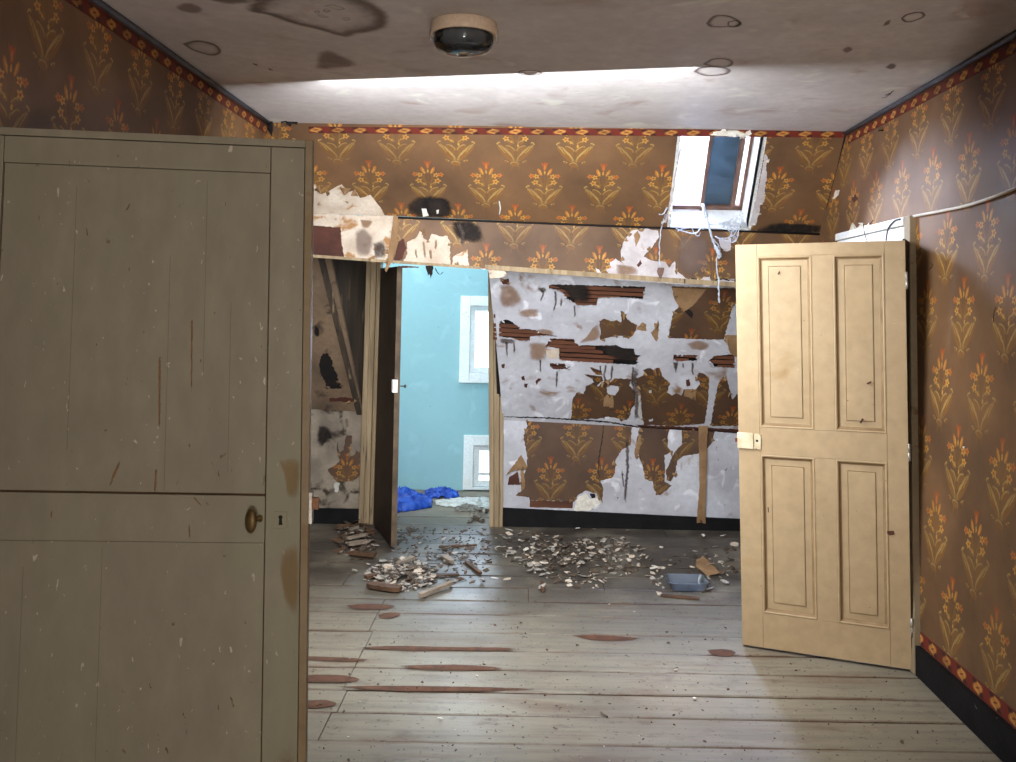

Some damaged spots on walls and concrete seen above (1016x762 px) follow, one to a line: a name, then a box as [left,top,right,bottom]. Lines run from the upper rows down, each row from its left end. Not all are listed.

damp [215,0,385,36]
damp [694,58,733,76]
peeling [314,186,358,196]
spalling [313,226,344,257]
spalling [488,268,510,285]
spalling [549,284,645,306]
spalling [493,314,656,387]
spalling [673,338,735,381]
spalling [319,353,356,404]
spalling [530,493,601,511]